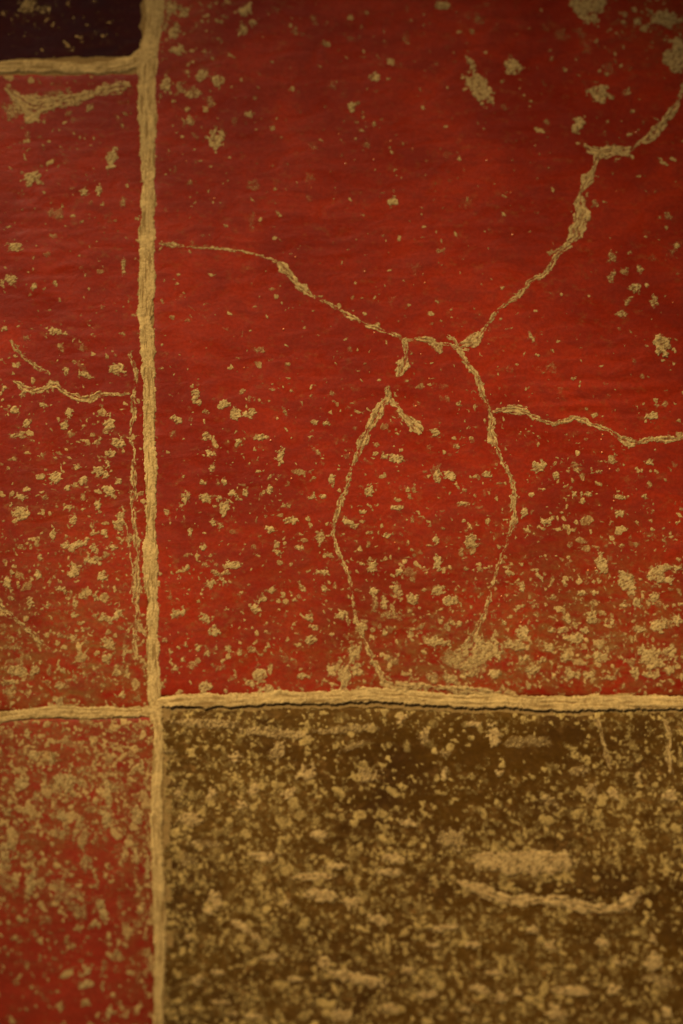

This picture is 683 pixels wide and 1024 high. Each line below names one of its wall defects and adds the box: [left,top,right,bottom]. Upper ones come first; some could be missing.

spalling [191,388,257,421]
crack [160,83,683,691]
crack [10,340,147,660]
spalling [36,412,127,632]
spalling [181,432,248,529]
crack [0,603,50,649]
spalling [326,608,398,687]
spalling [367,560,418,635]
spalling [421,552,683,689]
leakage [593,718,611,770]
leakage [664,719,672,773]
leakage [457,880,642,914]